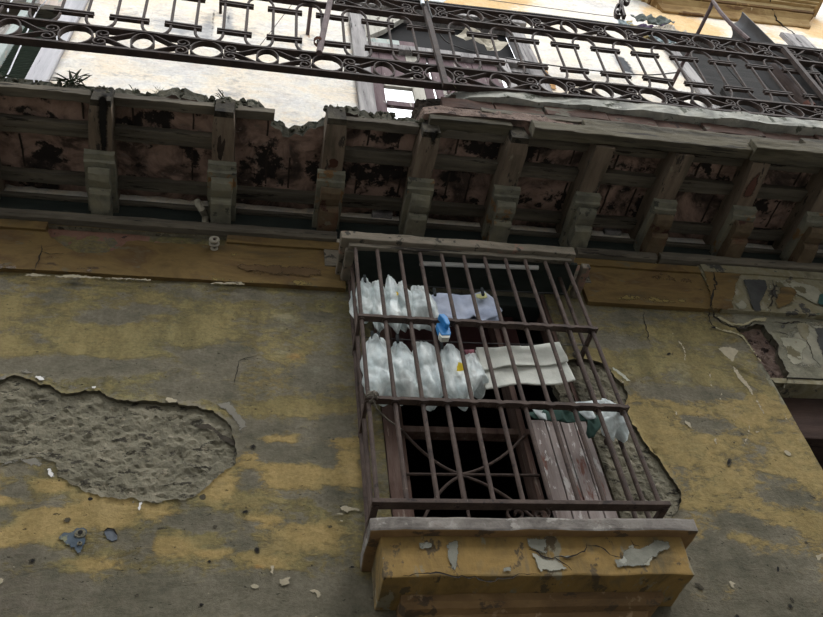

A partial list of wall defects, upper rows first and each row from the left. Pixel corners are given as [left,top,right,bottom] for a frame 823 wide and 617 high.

crack [708,267,752,329]
flaking render [712,279,823,378]
crack [768,280,820,365]
flaking render [555,362,630,404]
peeling [718,347,764,413]
flaking render [0,370,247,510]
flaking render [593,429,680,519]
peeling [527,538,570,572]
peeling [615,540,670,568]